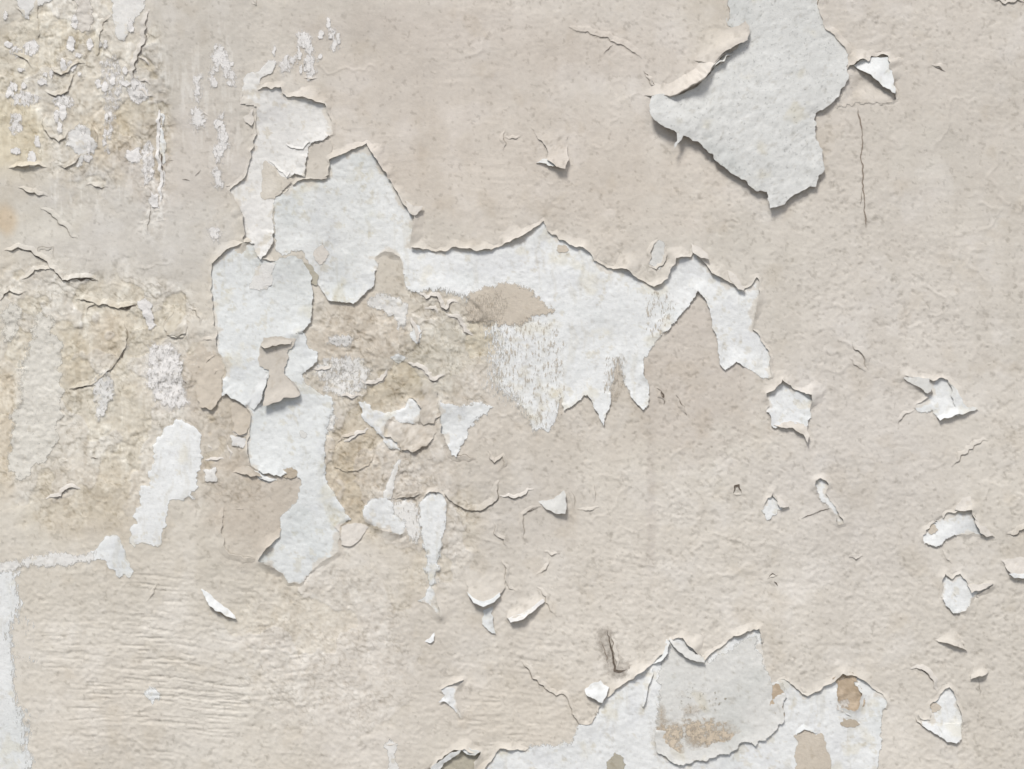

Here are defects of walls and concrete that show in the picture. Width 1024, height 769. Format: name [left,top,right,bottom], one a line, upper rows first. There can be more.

spalling [836,48,904,108]
crack [858,114,867,224]
peeling [91,60,827,643]
spalling [894,366,978,429]
spalling [919,496,1024,616]
peeling [430,621,892,769]
spalling [911,664,969,744]